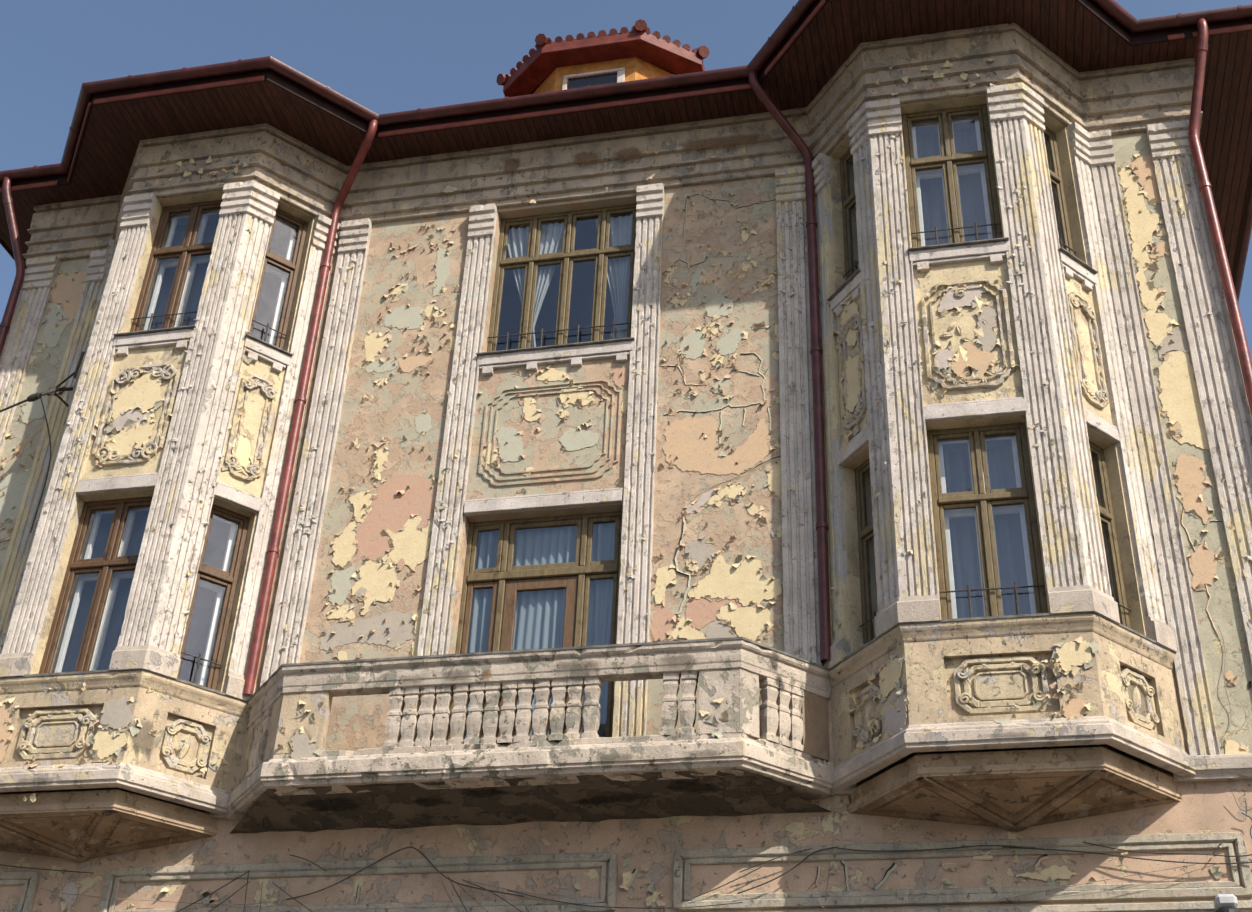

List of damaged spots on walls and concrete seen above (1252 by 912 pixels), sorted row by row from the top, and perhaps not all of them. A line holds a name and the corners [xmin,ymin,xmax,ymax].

peeling [29,271,87,364]
peeling [819,232,1034,475]
peeling [0,318,217,542]
peeling [482,193,789,643]
crack [661,324,781,617]
peeling [320,410,462,661]
peeling [0,687,32,762]
peeling [23,682,157,770]
peeling [699,697,730,739]
peeling [848,655,910,748]
peeling [1032,636,1099,721]
peeling [1010,855,1096,886]